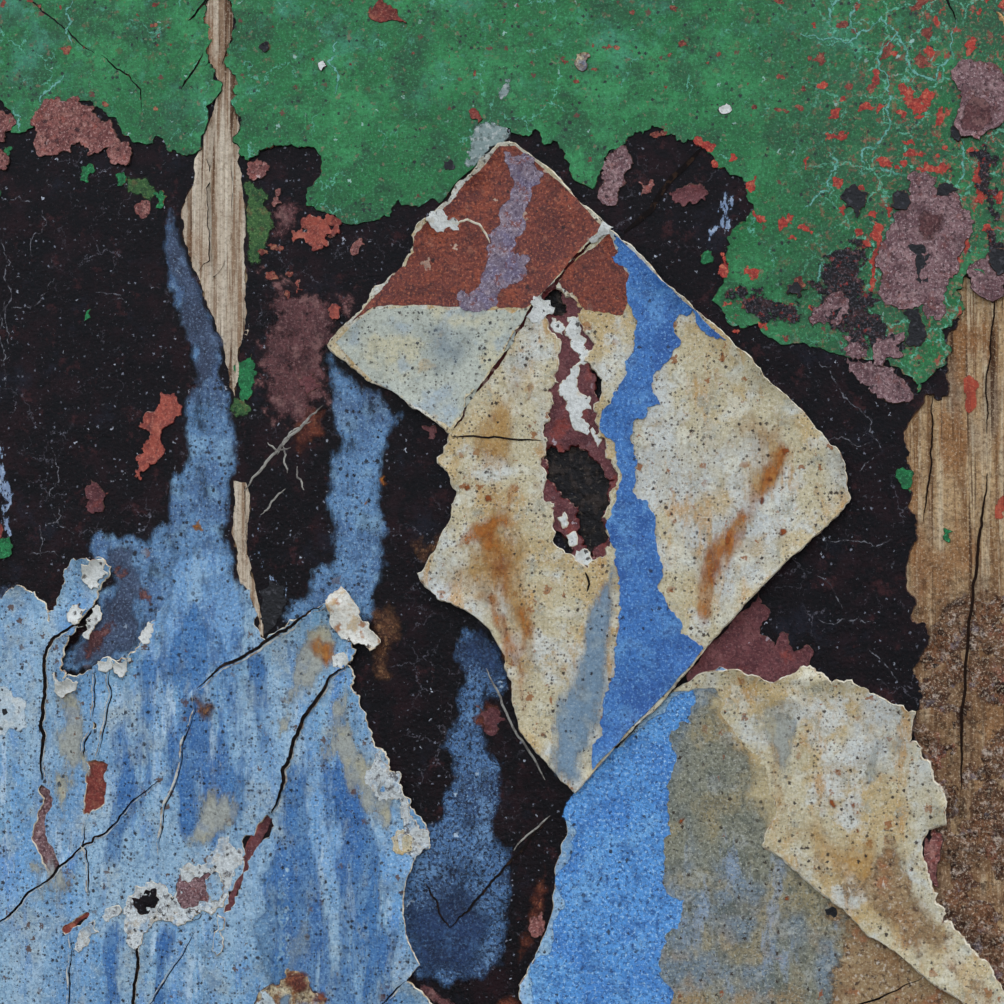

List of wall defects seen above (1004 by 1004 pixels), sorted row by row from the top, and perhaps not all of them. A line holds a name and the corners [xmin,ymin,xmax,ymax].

peeling [116,172,167,209]
peeling [693,136,737,168]
crack [800,0,957,210]
crack [454,242,591,428]
peeling [63,213,248,683]
peeling [230,141,1004,1004]
crack [960,473,1004,790]
spalling [84,760,108,814]
crack [0,605,323,924]
crack [271,667,346,813]
crack [131,933,192,1004]
peeling [63,816,272,956]